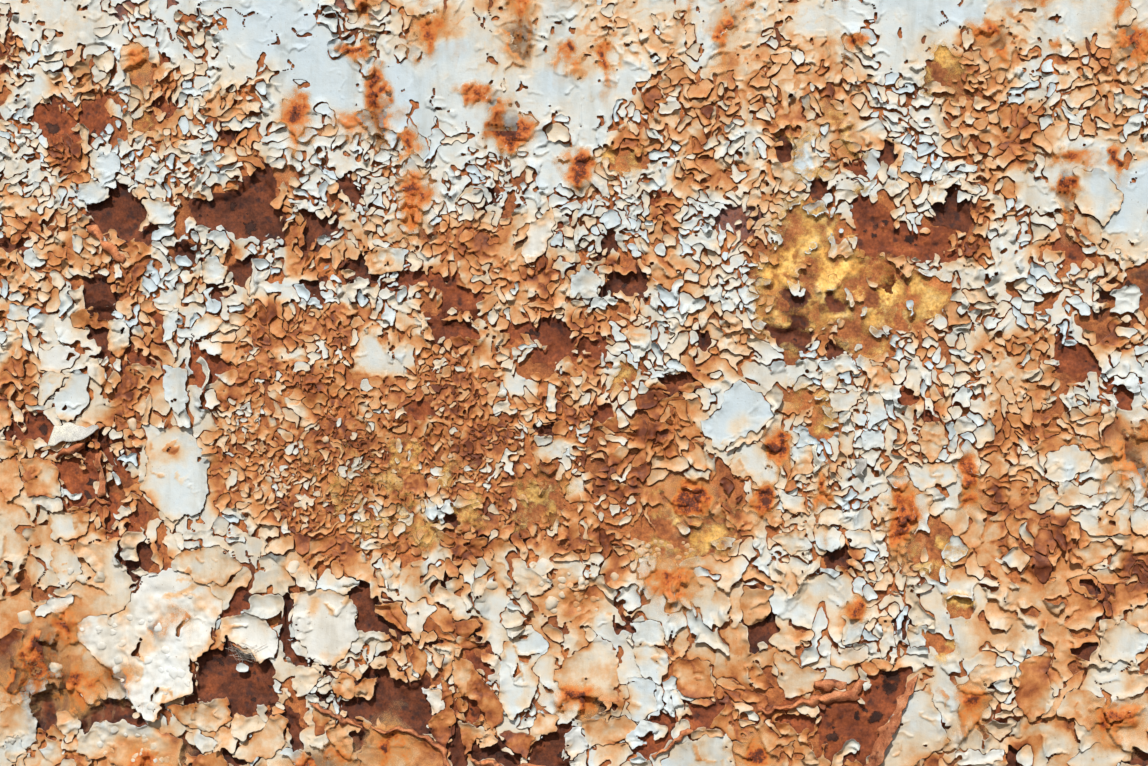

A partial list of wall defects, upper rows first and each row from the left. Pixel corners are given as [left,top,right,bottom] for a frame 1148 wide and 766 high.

peeling [312,0,412,76]
corrosion [803,136,975,267]
peeling [1073,167,1124,226]
peeling [437,307,472,322]
corrosion [298,246,651,374]
corrosion [759,286,850,361]
peeling [781,242,878,316]
corrosion [185,338,232,394]
peeling [684,468,710,480]
corrosion [180,576,618,766]
peeling [787,702,826,724]
corrosion [736,661,924,766]